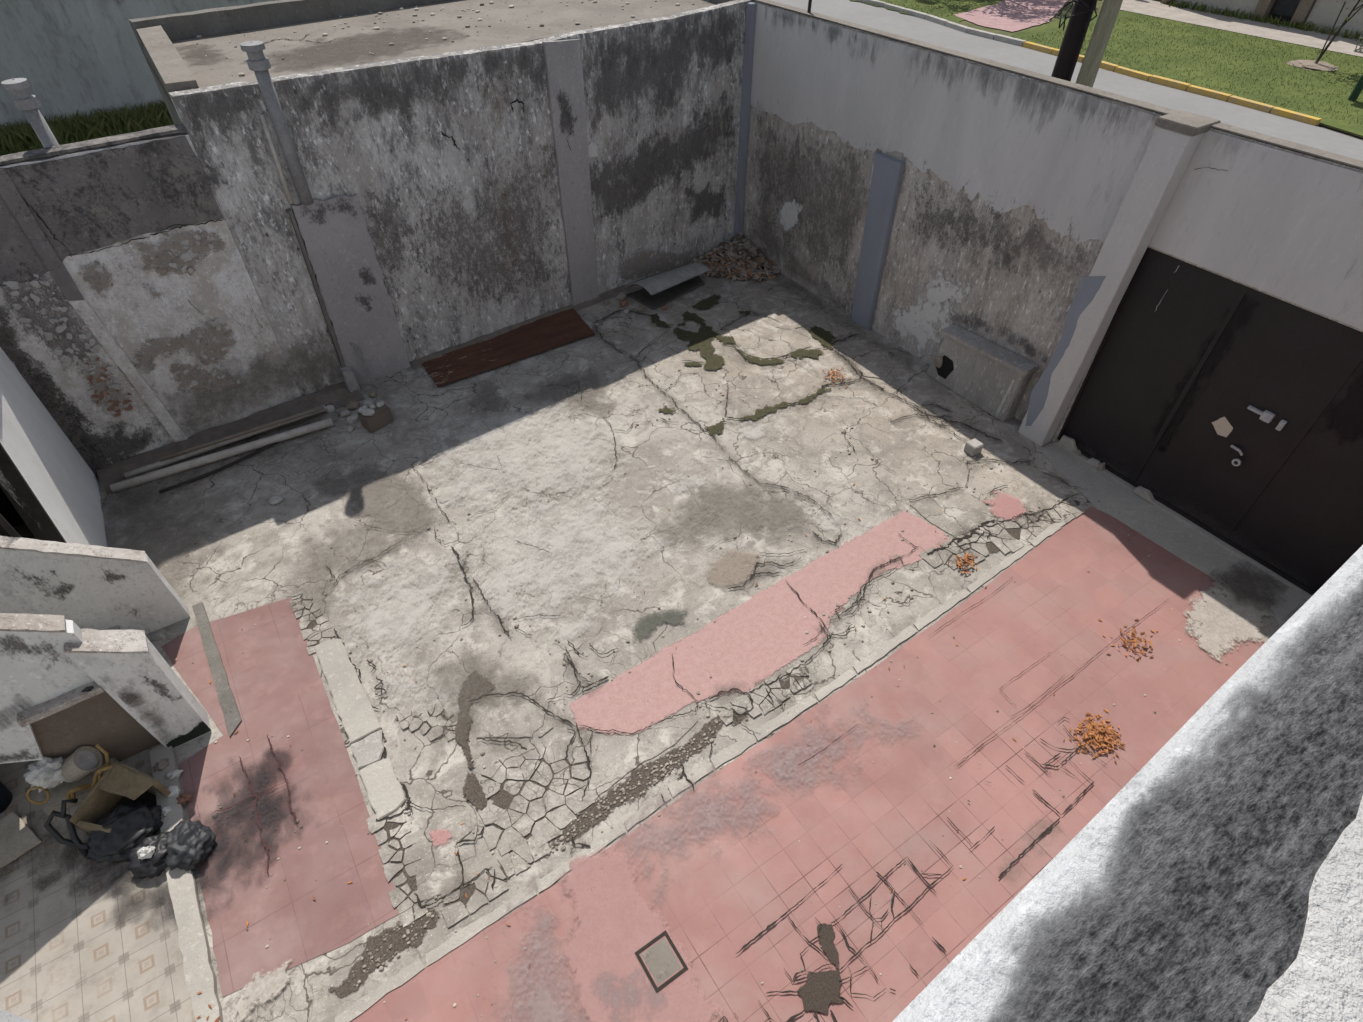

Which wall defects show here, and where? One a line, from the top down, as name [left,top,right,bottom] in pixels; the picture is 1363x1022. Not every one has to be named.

leakage [183,89,257,194]
leakage [270,28,547,129]
leakage [556,10,744,225]
peeling [137,228,226,299]
leakage [310,145,566,311]
peeling [0,273,136,418]
peeling [131,318,240,393]
crack [326,310,1079,802]
spalling [717,663,812,726]
crack [334,628,495,908]
crack [570,836,590,854]
crack [718,599,1168,1022]